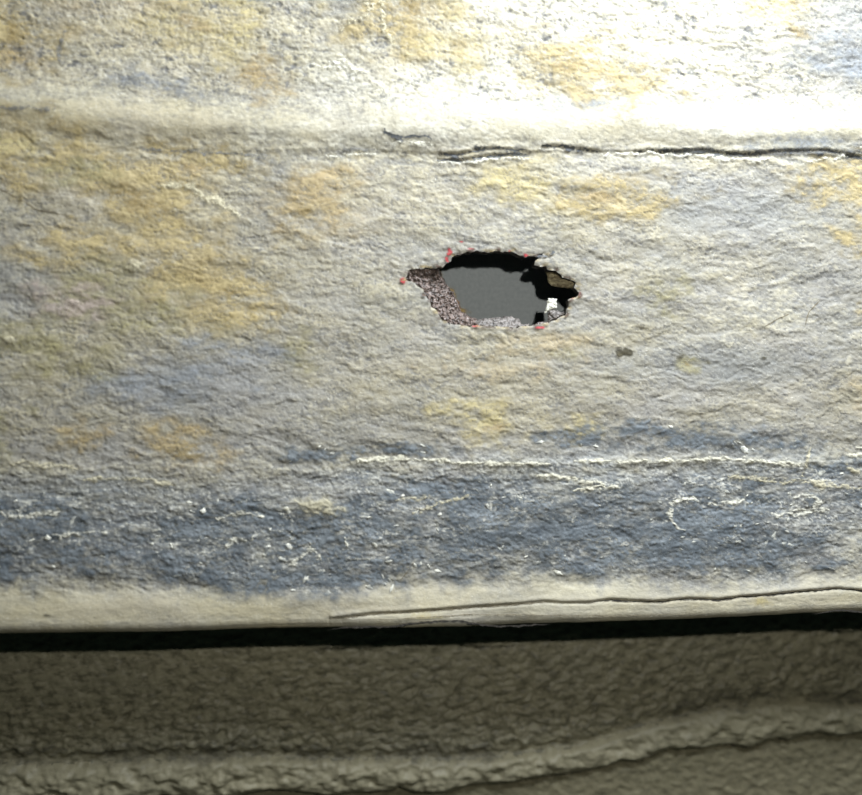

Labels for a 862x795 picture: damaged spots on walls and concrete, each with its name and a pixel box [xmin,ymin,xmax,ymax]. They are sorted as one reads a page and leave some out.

crack [143,147,265,159]
crack [341,128,598,163]
crack [638,147,862,159]
crack [338,588,862,620]